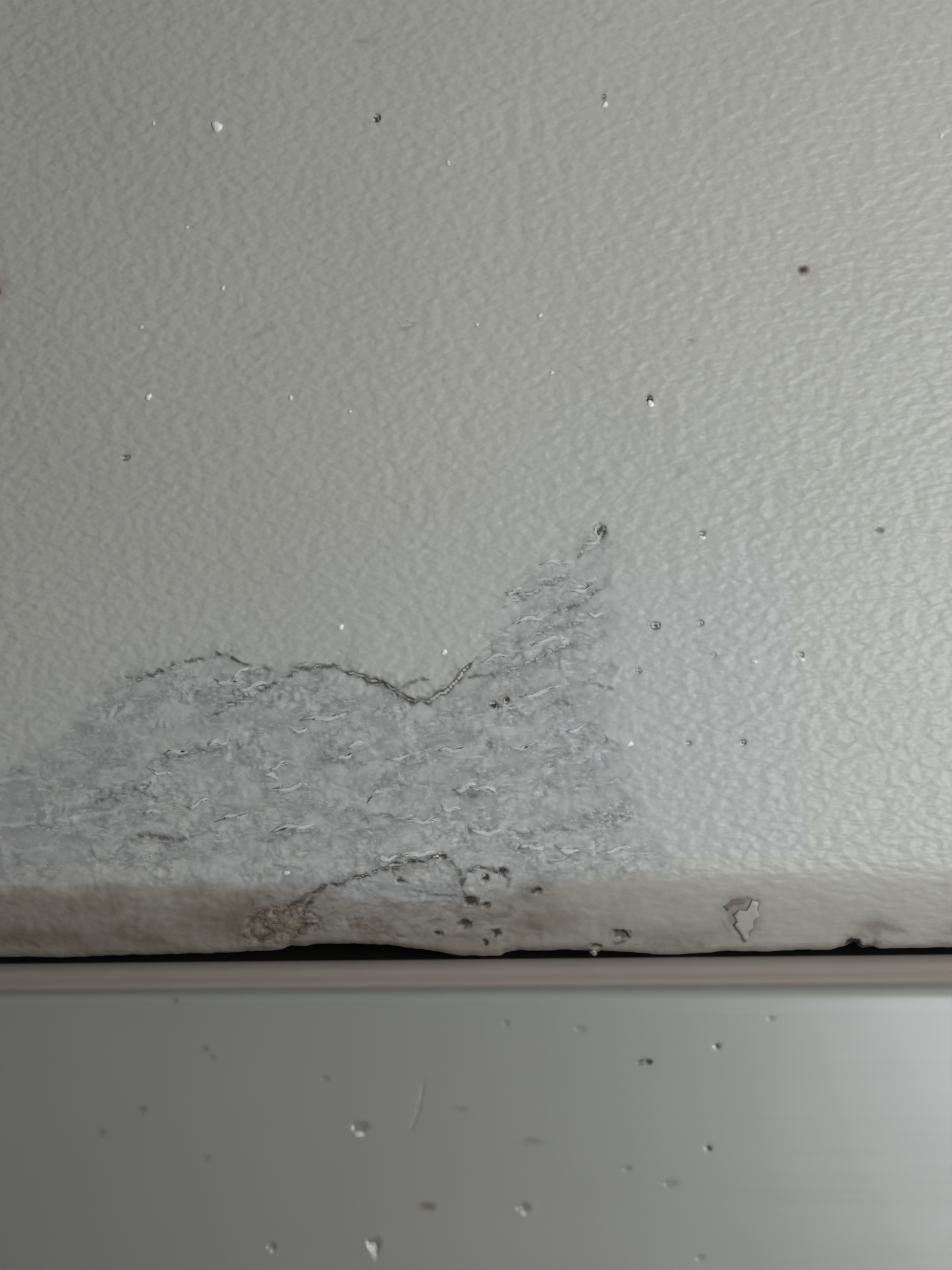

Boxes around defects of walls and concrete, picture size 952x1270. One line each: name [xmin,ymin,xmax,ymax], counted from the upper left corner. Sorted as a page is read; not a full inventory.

crack [122,649,484,717]
peeling [51,522,688,954]
crack [278,850,513,919]
peeling [716,890,767,943]